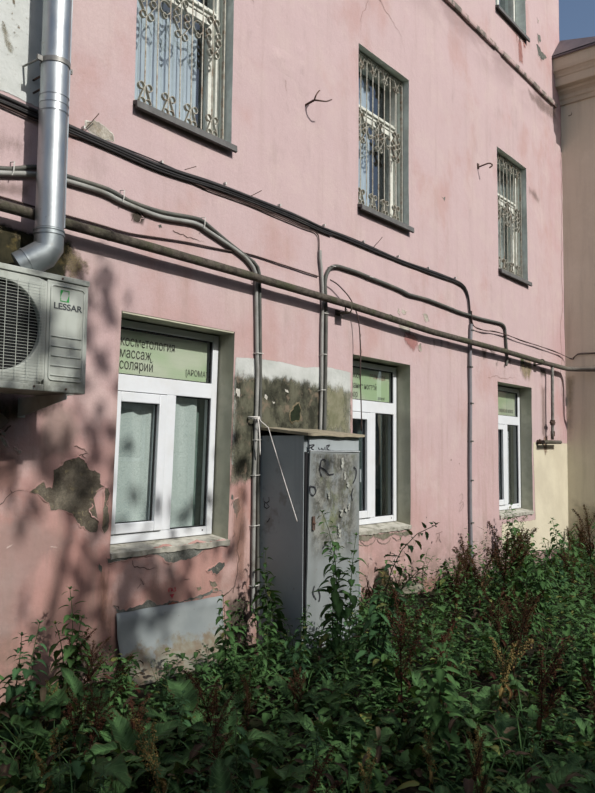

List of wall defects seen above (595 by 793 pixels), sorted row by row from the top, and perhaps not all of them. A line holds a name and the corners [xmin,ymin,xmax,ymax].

spalling [290,404,301,422]
flaking render [29,455,111,535]
flaking render [97,539,226,573]
flaking render [113,562,225,613]